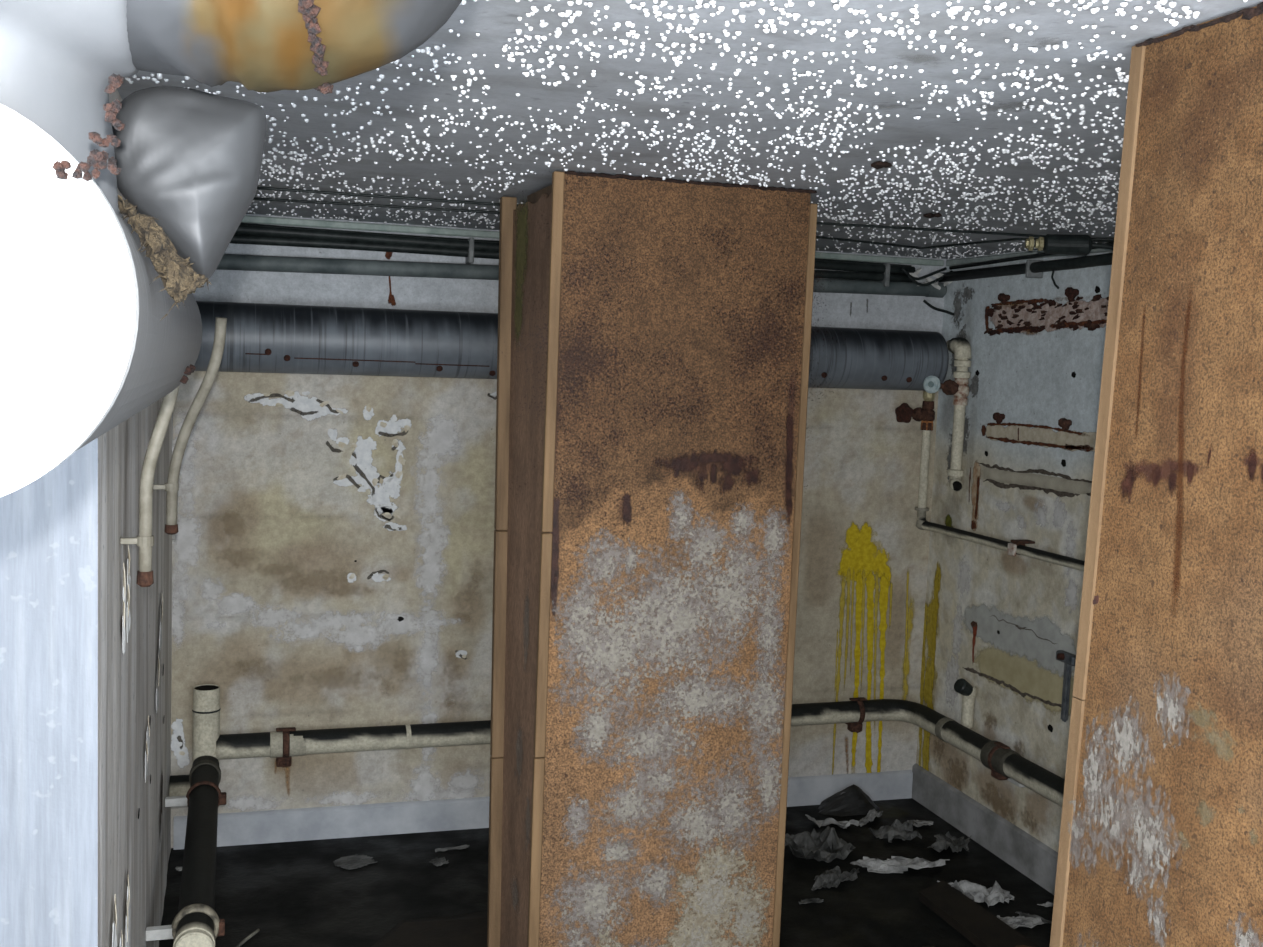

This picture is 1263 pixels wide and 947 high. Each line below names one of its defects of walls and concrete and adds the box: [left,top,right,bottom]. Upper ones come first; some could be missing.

corrosion [1136,311,1145,433]
peeling [244,390,412,531]
corrosion [1174,302,1191,593]
leakage [172,414,460,688]
leakage [509,170,837,947]
leakage [422,707,437,724]
leakage [405,747,478,801]
leakage [1068,705,1174,895]
leakage [1155,687,1182,748]
leakage [1149,906,1167,947]
mould [1233,928,1254,947]